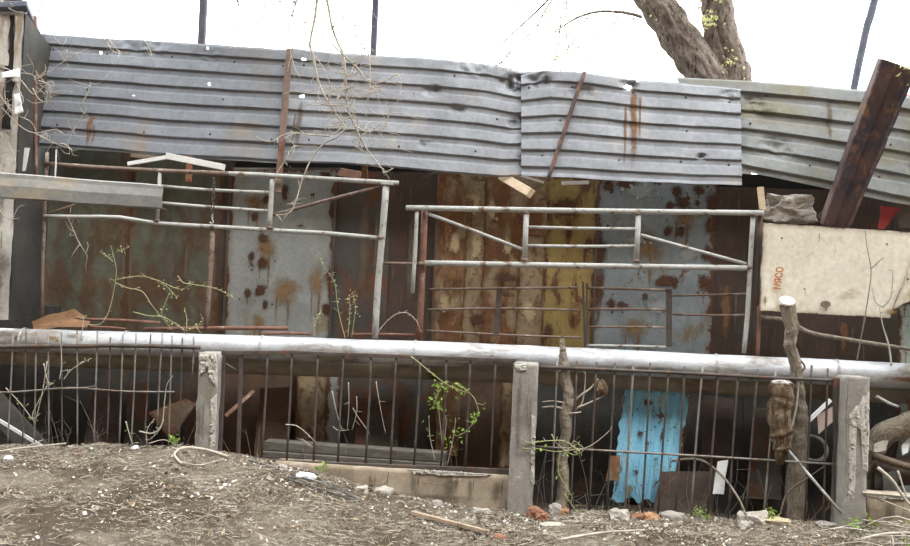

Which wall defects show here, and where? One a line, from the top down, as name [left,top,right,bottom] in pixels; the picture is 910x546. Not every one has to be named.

rust [624,93,641,155]
rust [603,180,639,194]
rust [551,198,578,263]
rust [663,185,720,260]
rust [239,195,295,336]
rust [310,259,335,328]
rust [584,236,628,323]
rust [638,238,679,289]
rust [697,274,712,303]
rust [544,324,553,347]